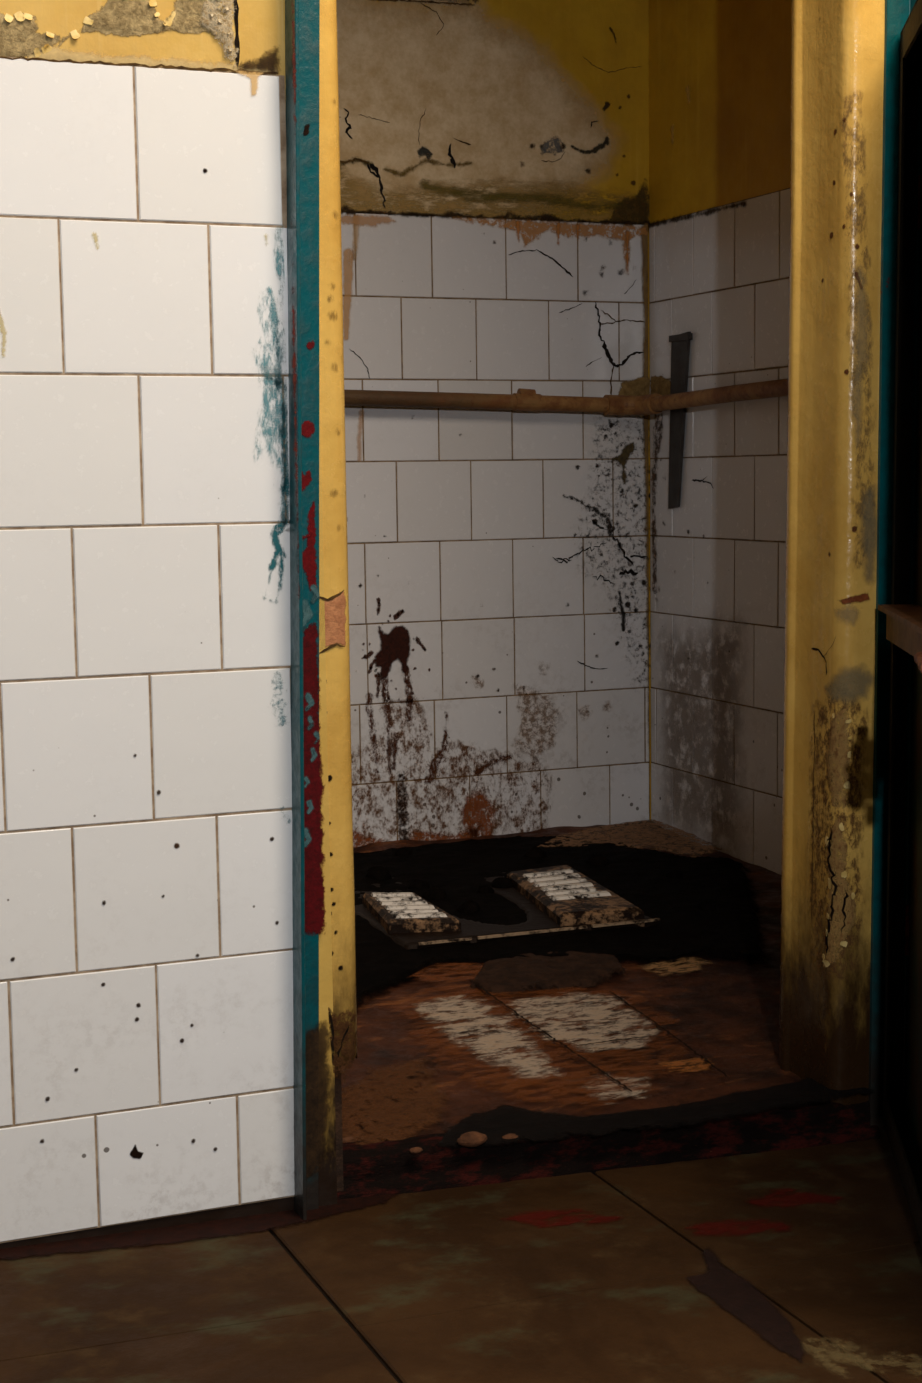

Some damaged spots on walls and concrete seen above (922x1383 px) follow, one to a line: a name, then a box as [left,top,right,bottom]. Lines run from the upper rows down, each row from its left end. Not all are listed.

flaking render [0,0,239,67]
crack [340,108,390,207]
crack [448,138,471,168]
peeling [336,0,610,218]
crack [571,121,609,173]
crack [509,249,644,395]
water stain [362,597,430,840]
water stain [424,712,448,783]
water stain [475,755,512,775]
peeling [810,670,872,979]